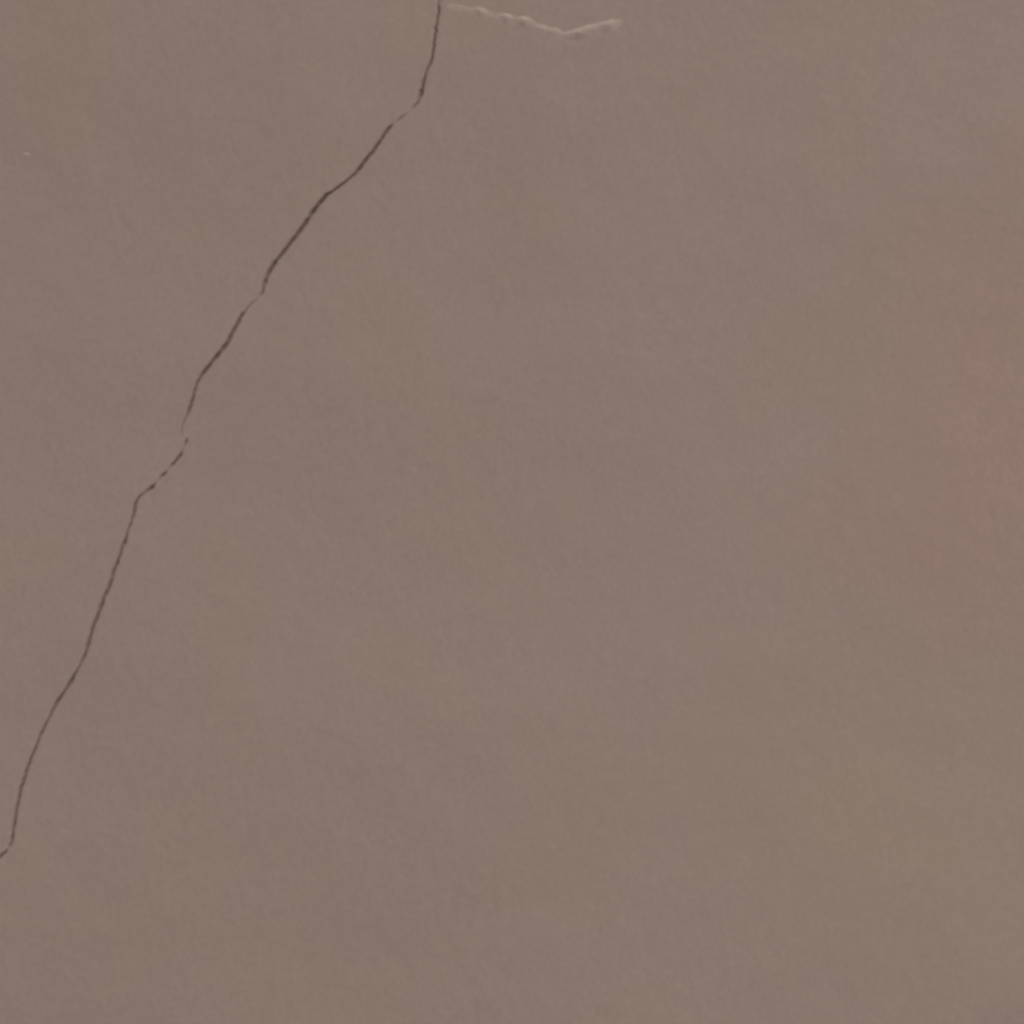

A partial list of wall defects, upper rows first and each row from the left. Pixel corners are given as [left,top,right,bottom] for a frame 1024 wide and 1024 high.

crack [0,0,441,859]